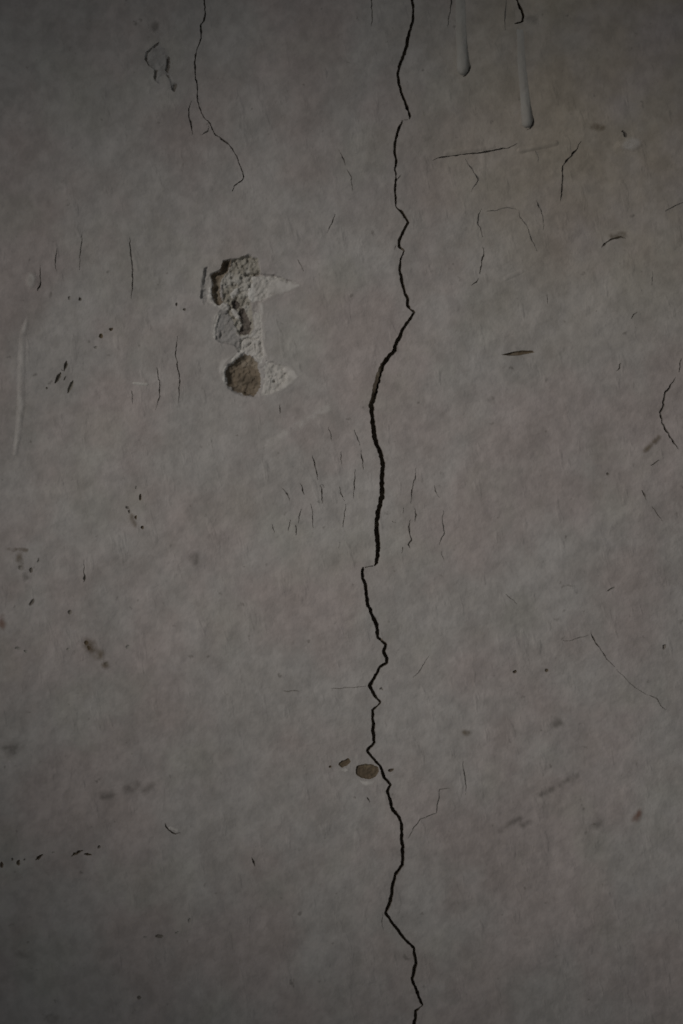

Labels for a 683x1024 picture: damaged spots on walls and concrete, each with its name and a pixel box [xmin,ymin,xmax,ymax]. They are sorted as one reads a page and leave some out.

crack [188,0,244,192]
crack [434,140,581,285]
spalling [200,253,299,399]
crack [659,358,682,448]
crack [272,0,467,1024]
spalling [329,758,394,779]